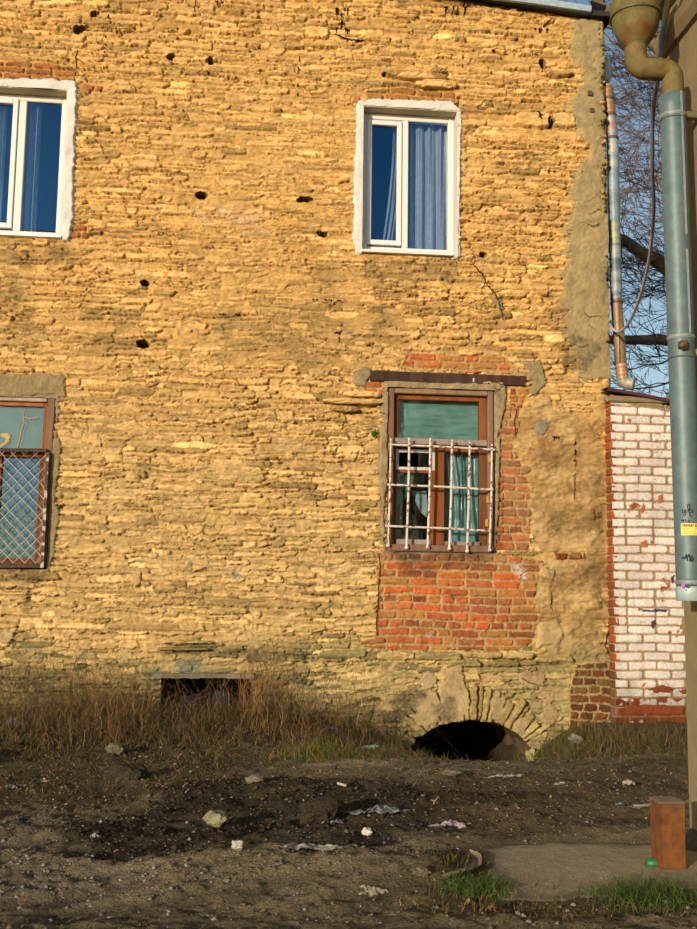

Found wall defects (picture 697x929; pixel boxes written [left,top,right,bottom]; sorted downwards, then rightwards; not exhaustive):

crack [473,264,504,321]
peeling [492,385,507,553]
peeling [535,619,565,649]
peeling [411,663,472,731]
peeling [489,690,507,721]
peeling [511,717,529,737]
peeling [519,667,561,726]
peeling [625,685,686,714]